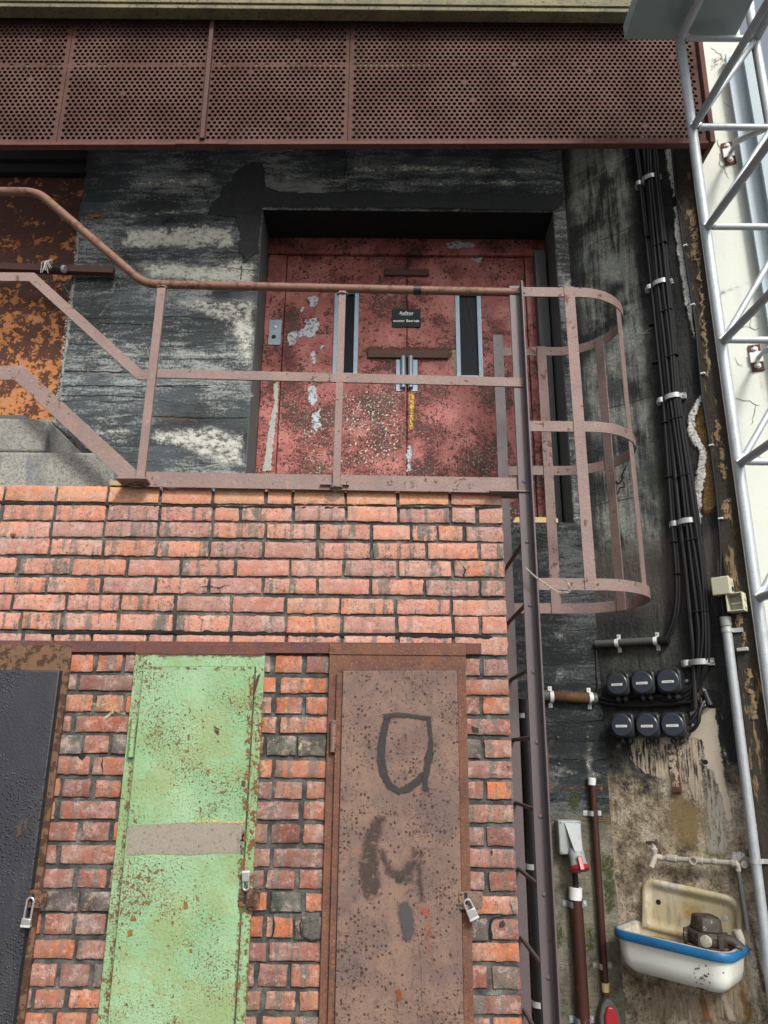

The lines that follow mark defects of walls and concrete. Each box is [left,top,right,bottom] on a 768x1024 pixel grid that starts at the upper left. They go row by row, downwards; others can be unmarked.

peeling [287,296,324,364]
damp [687,396,716,519]
rust [104,765,136,1022]
rust [140,654,264,1021]
damp [651,917,766,1021]